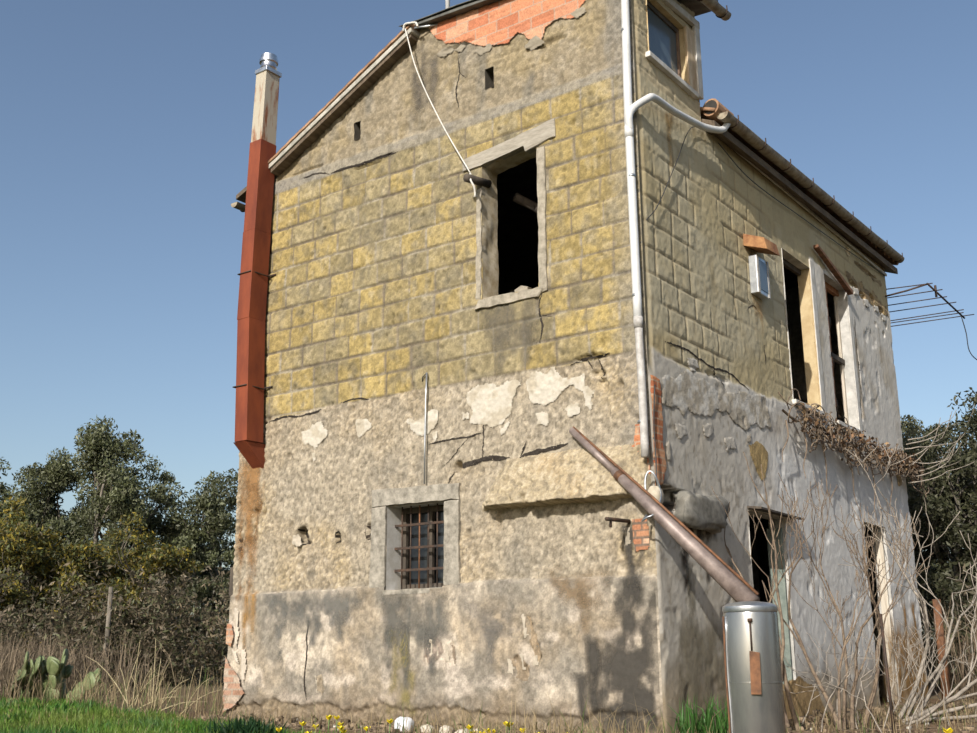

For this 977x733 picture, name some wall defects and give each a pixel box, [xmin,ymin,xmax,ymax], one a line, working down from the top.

spalling [429,0,586,58]
crack [665,341,749,390]
peeling [462,367,595,435]
spalling [292,529,311,546]
spalling [223,608,247,712]
spalling [423,637,456,664]
spalling [507,614,542,681]